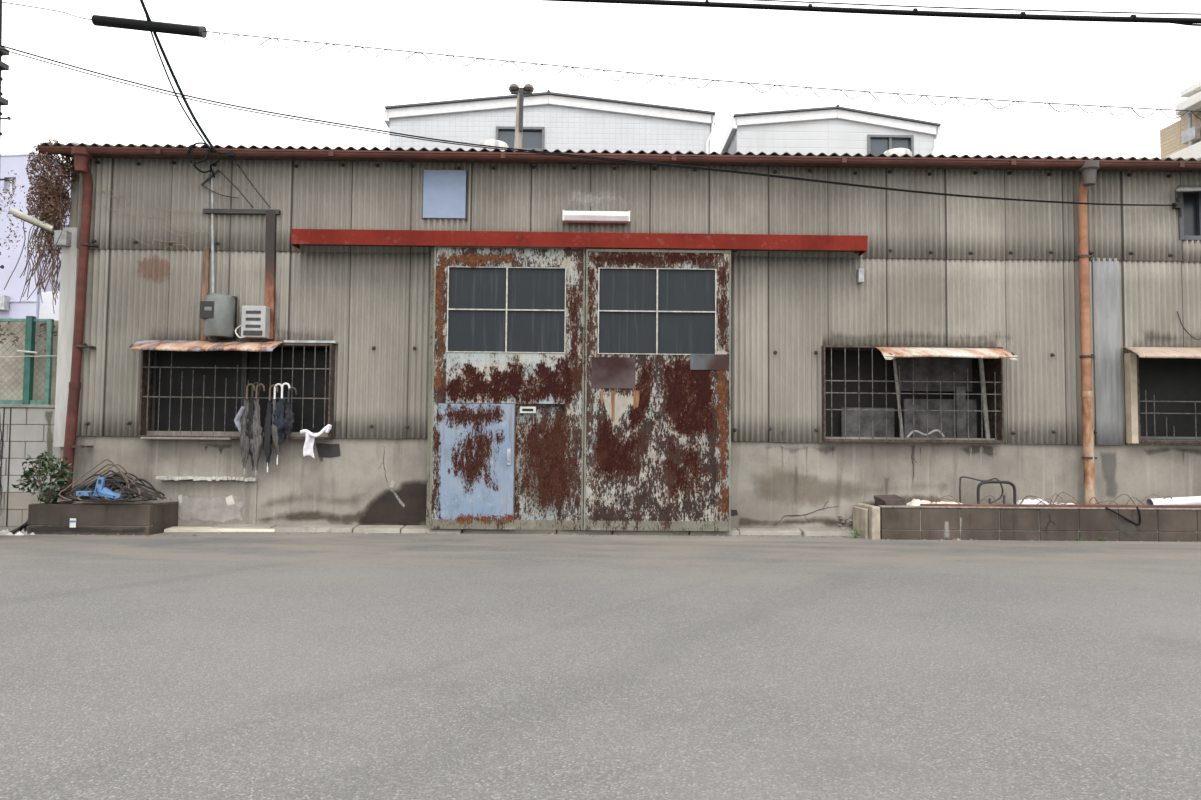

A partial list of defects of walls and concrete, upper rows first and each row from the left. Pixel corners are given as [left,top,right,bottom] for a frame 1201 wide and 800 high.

corrosion [431,250,516,391]
corrosion [567,249,728,388]
corrosion [434,413,513,524]
corrosion [600,390,640,427]
corrosion [656,370,729,517]